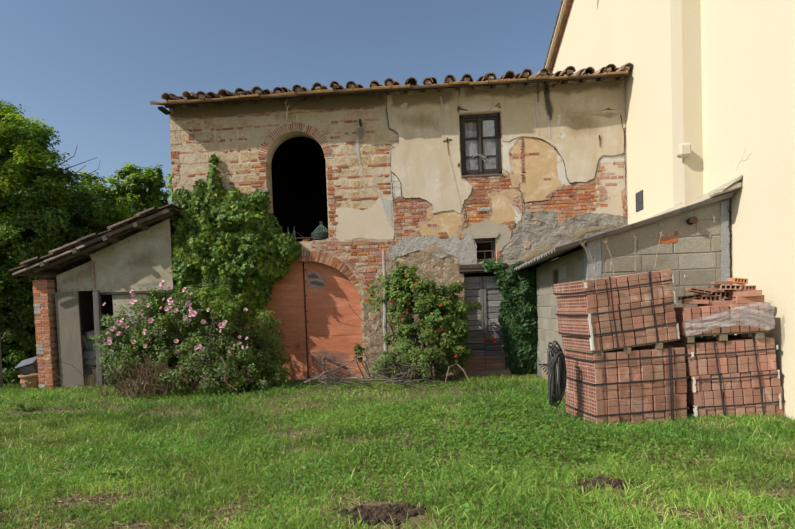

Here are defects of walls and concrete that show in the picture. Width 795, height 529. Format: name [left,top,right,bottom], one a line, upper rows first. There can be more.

water stain [467,81,619,138]
spalling [311,137,627,288]